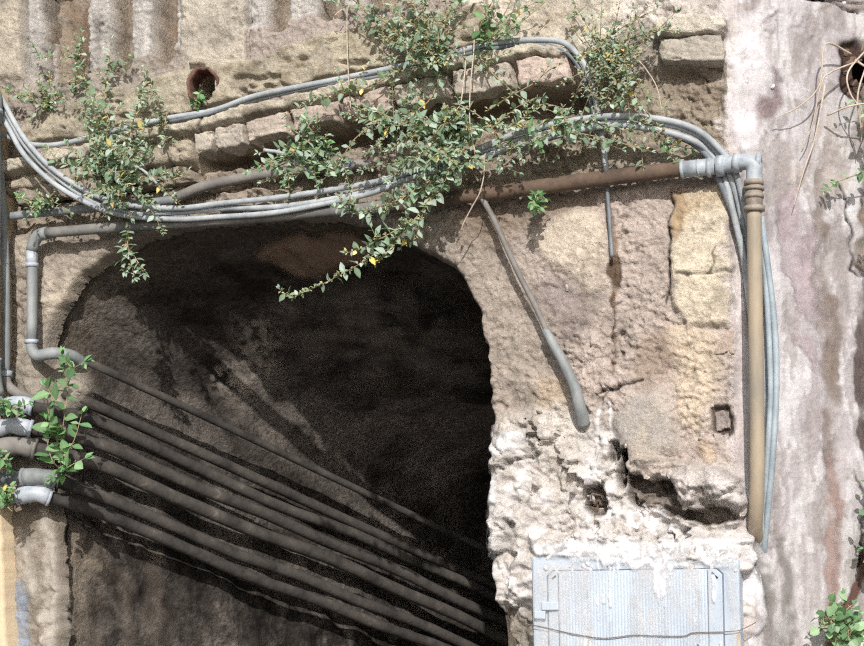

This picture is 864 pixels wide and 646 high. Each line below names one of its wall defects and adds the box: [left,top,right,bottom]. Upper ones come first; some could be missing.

crack [808,0,858,14]
crack [663,197,729,301]
damp [813,206,830,237]
crack [839,185,862,276]
spalling [710,401,734,435]
damp [822,285,840,401]
damp [855,310,864,451]
damp [488,474,497,508]
spalling [586,485,610,515]
spalling [608,437,748,525]
damp [823,409,843,606]